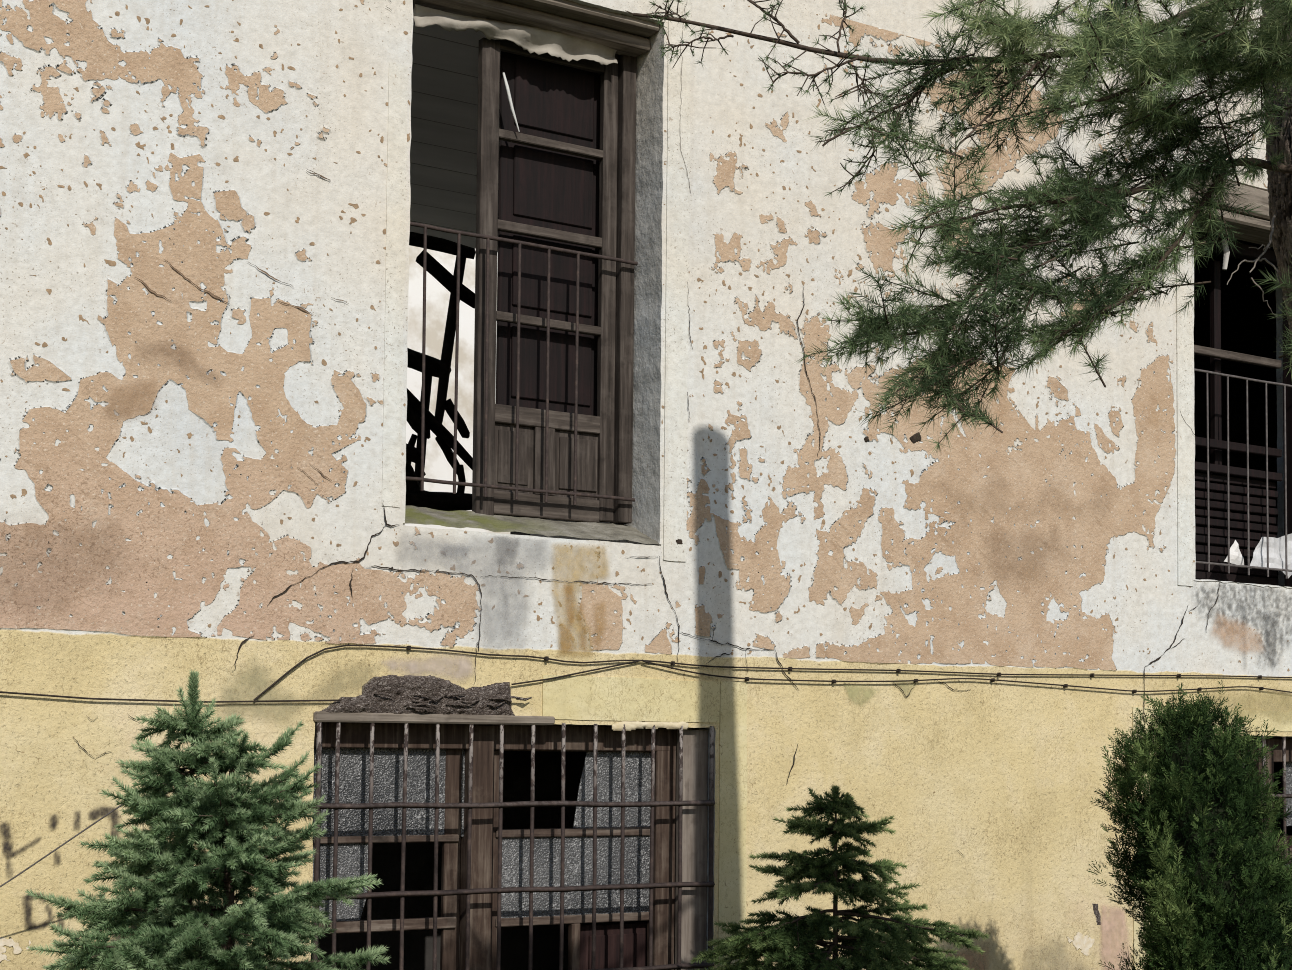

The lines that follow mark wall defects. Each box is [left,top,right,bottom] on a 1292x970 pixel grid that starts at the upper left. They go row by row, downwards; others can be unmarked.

peeling [808,13,940,96]
peeling [0,0,724,655]
peeling [676,52,1177,672]
crack [267,505,798,689]
crack [1143,583,1220,720]
water stain [1198,585,1292,664]
spalling [0,936,31,963]